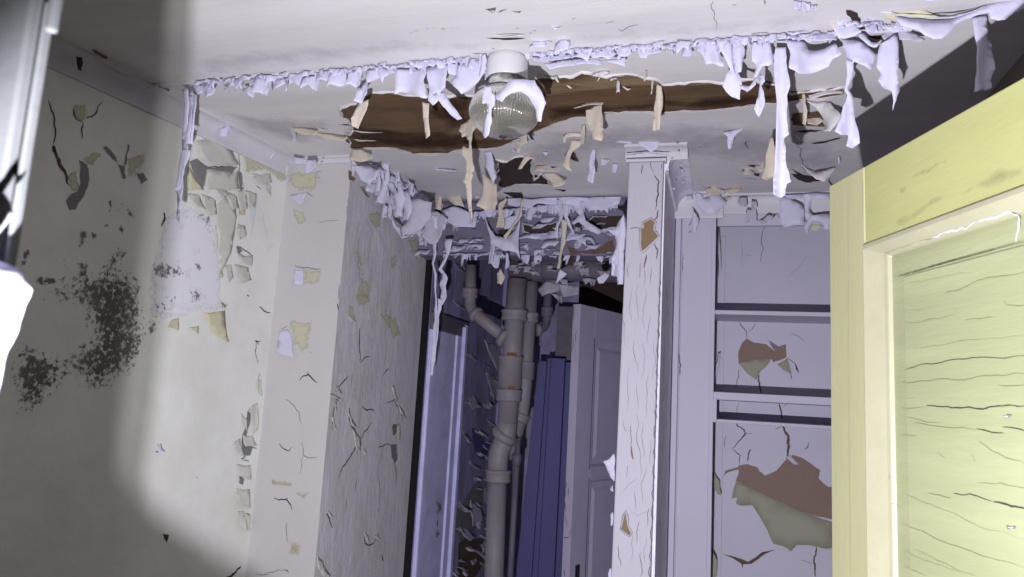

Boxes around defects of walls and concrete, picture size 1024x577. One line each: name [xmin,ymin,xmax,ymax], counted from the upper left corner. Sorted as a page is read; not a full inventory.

crack [48,99,69,185]
peeling [92,0,1024,376]
water stain [13,248,175,410]
water stain [152,263,183,278]
peeling [233,374,262,532]
crack [279,304,391,577]
peeling [453,340,501,577]
crack [618,263,681,575]
crack [723,549,775,568]
peeling [736,322,802,393]
peeling [713,424,832,551]
crack [889,242,1024,575]